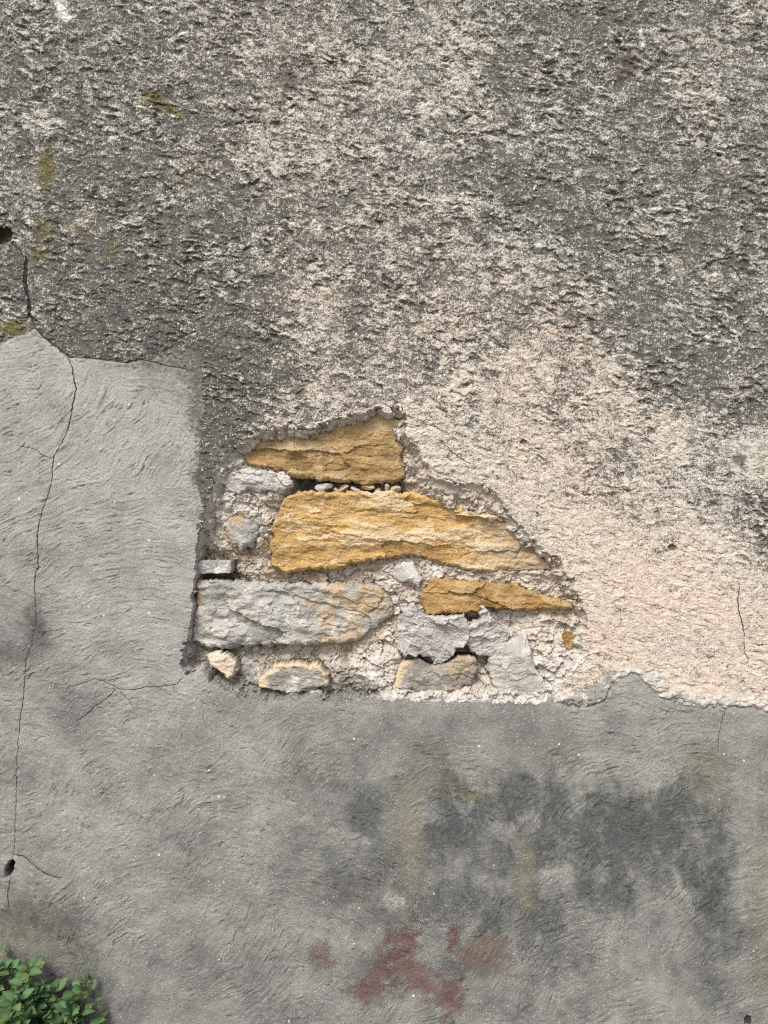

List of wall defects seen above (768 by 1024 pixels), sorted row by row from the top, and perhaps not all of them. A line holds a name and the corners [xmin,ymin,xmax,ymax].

crack [7,244,192,905]
spalling [180,405,768,712]
leakage [383,773,729,949]